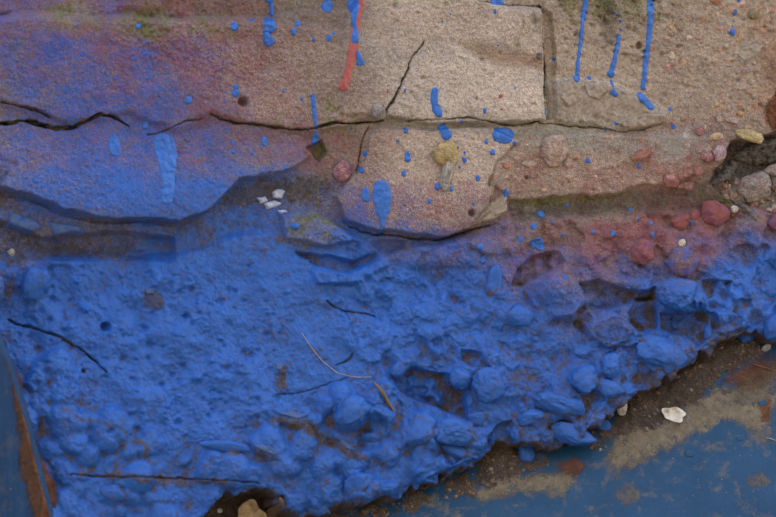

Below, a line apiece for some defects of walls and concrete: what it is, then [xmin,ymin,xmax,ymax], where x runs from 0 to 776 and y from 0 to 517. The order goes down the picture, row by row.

crack [0,102,128,131]
crack [148,42,424,173]
crack [407,28,652,132]
crack [10,320,105,372]
rust [5,359,58,517]
crack [75,474,255,483]